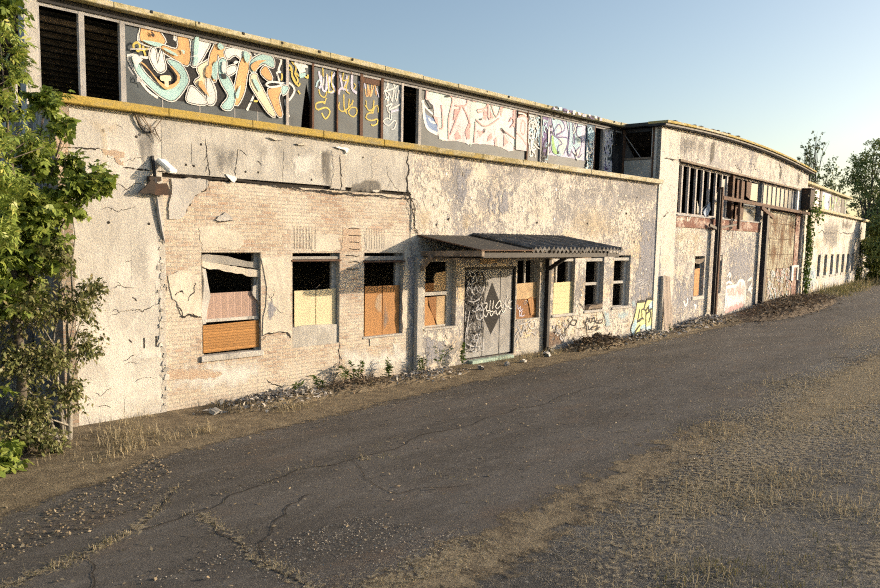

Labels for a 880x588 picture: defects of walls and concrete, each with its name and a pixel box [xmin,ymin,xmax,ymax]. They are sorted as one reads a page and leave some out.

crack [103,139,419,234]
spalling [155,195,222,412]